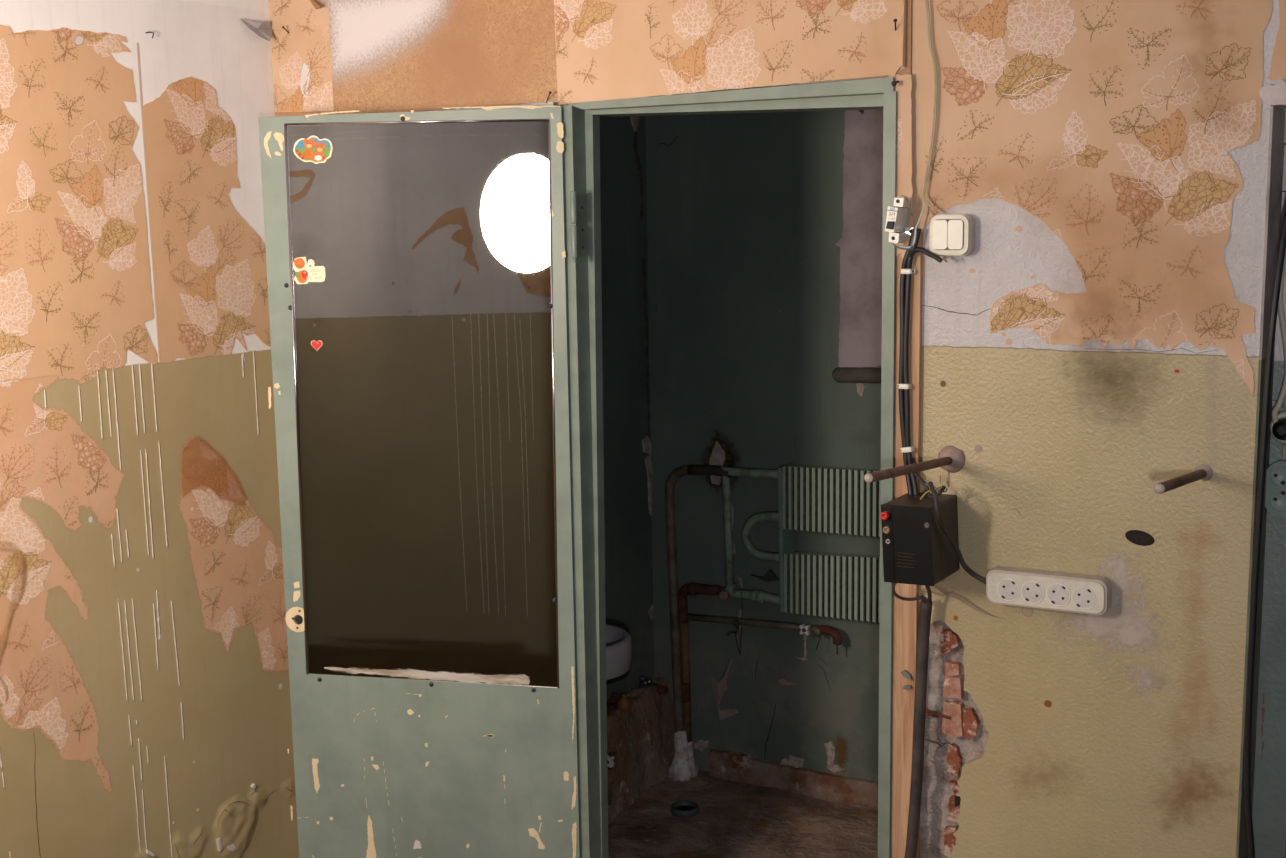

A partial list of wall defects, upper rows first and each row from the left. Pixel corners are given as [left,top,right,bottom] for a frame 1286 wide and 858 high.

peeling [240,19,272,41]
peeling [264,131,284,159]
damp [97,371,121,470]
damp [132,364,168,559]
peeling [704,433,739,486]
damp [111,510,129,568]
damp [118,598,142,701]
damp [153,590,180,687]
flaking render [920,616,989,858]